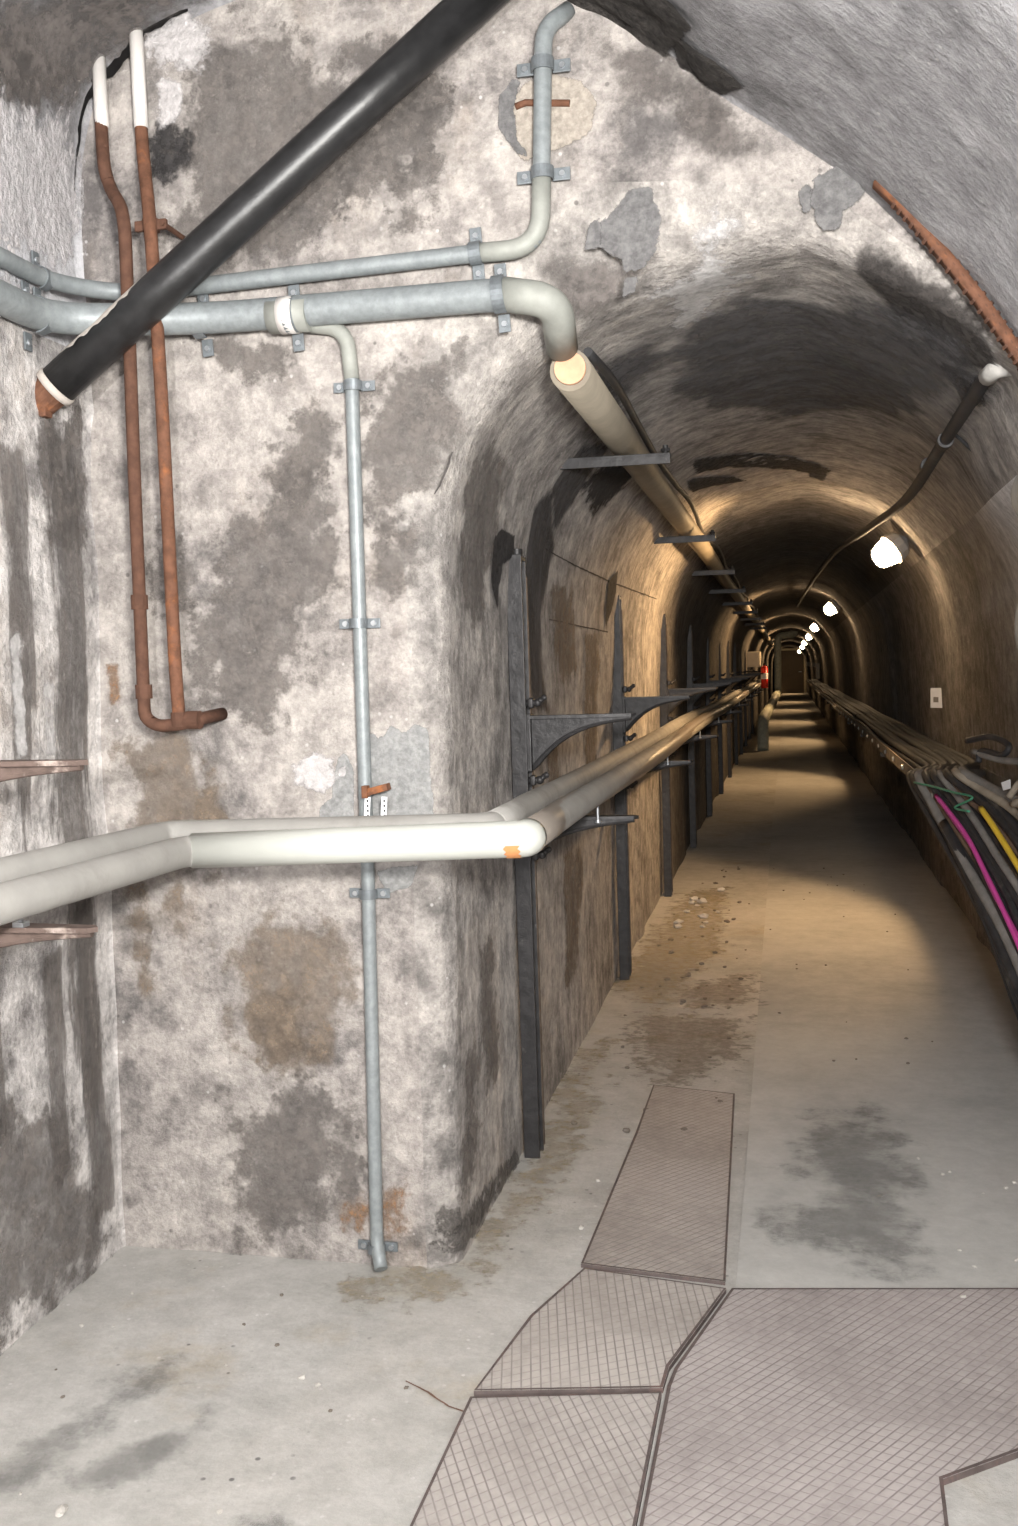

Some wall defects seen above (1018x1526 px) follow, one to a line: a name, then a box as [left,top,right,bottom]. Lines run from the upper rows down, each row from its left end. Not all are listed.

leakage [0,399,92,852]
leakage [145,405,341,736]
leakage [226,914,368,1255]
rust [341,1188,406,1238]